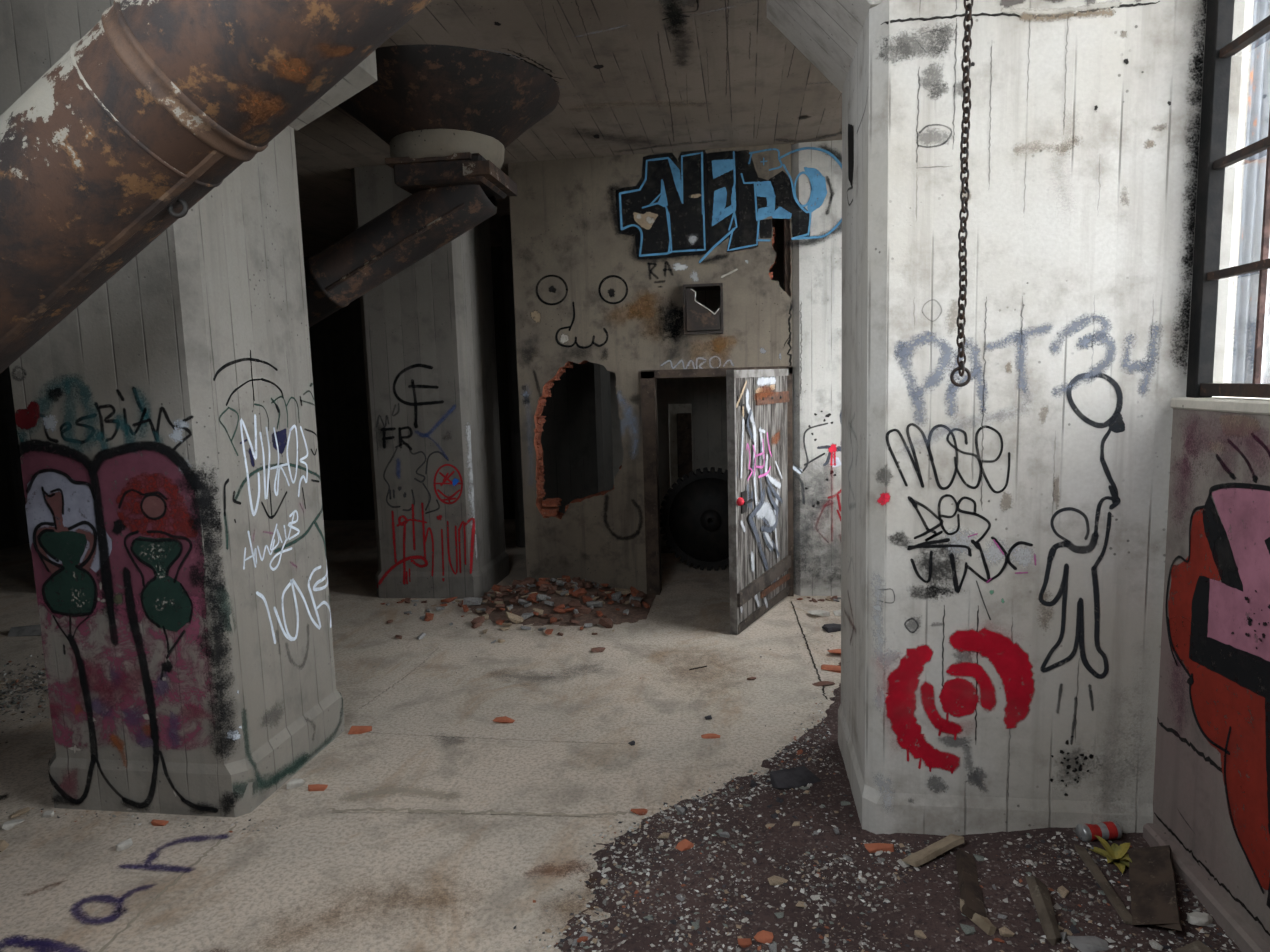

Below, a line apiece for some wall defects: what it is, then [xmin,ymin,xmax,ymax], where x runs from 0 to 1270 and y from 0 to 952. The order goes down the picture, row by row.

damp [660,0,699,66]
crack [914,67,922,163]
crack [881,0,1160,143]
spalling [535,361,614,517]